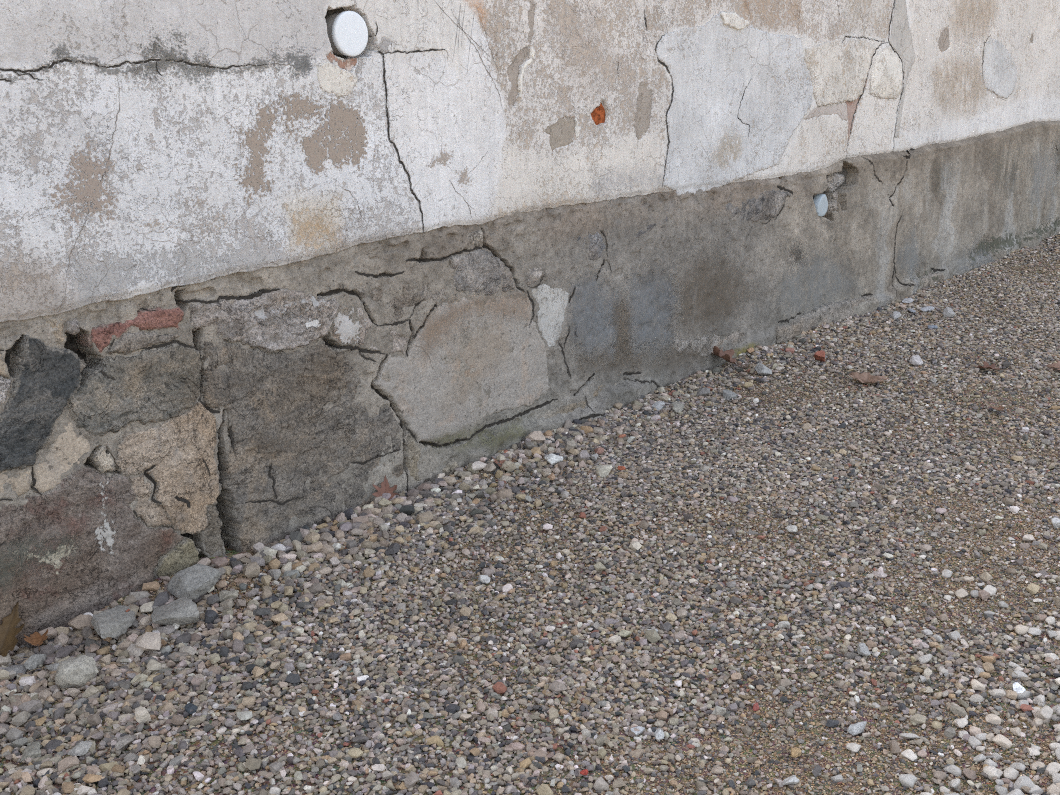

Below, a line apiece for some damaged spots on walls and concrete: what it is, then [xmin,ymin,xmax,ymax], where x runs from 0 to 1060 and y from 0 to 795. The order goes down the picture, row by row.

crack [0,58,312,182]
peeling [227,52,376,206]
crack [364,6,504,232]
peeling [426,143,454,168]
spalling [507,0,536,106]
spalling [544,102,606,151]
spalling [633,82,652,140]
crack [643,18,674,186]
peeling [804,80,867,144]
crack [830,1,945,297]
crack [317,156,612,492]
crack [246,463,306,505]